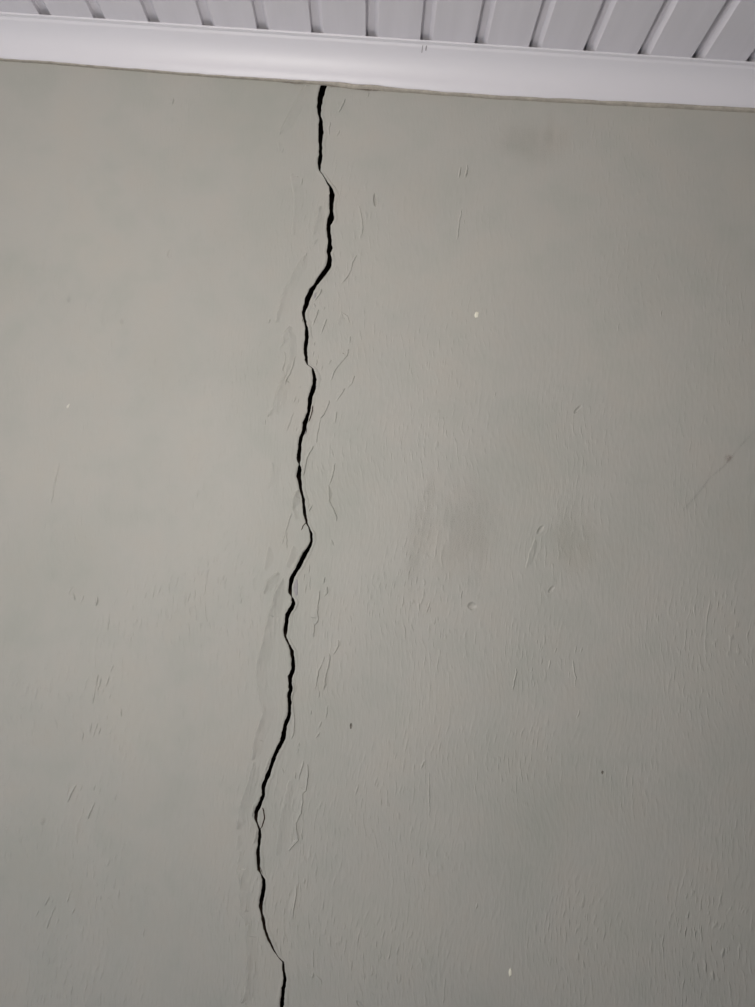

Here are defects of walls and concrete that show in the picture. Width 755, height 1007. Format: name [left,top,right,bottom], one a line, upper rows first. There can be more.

crack [250,85,339,1007]